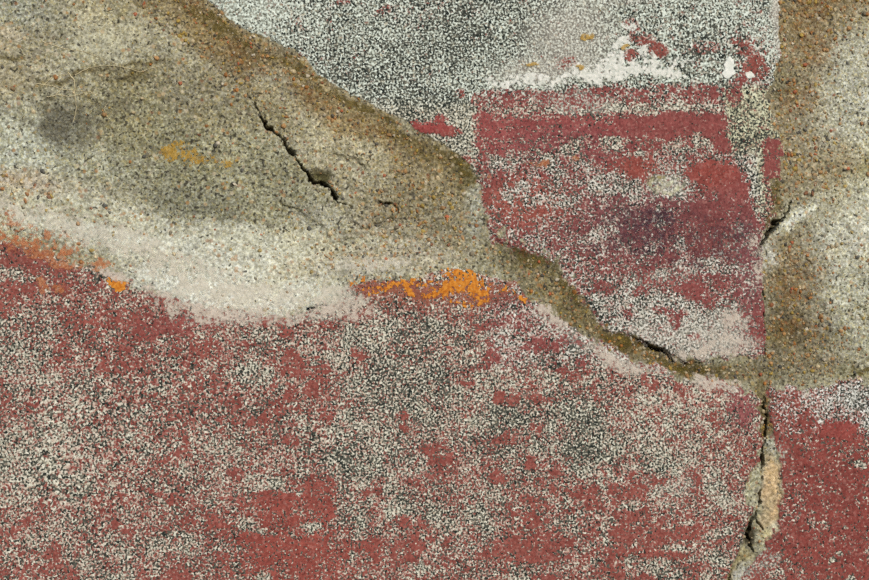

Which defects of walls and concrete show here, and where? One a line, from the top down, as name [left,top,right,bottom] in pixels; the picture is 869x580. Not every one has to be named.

crack [249,97,399,245]
crack [757,201,792,254]
crack [632,337,702,365]
crack [728,396,768,580]